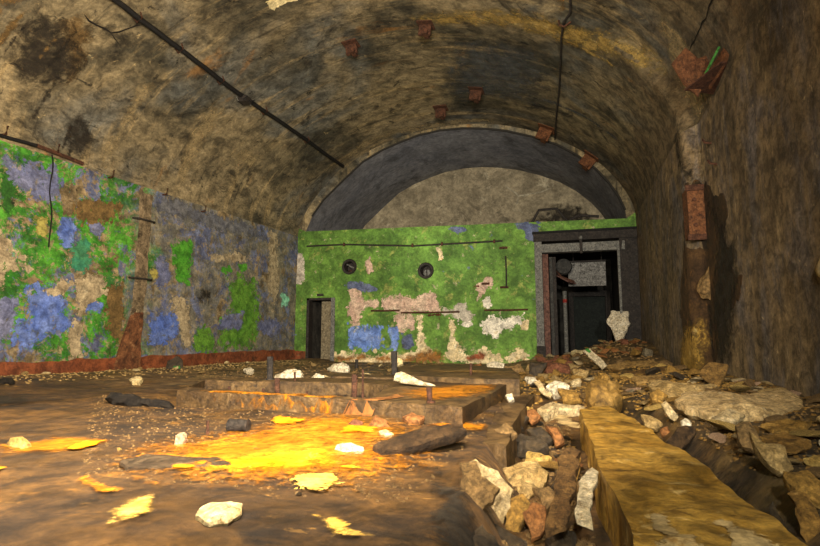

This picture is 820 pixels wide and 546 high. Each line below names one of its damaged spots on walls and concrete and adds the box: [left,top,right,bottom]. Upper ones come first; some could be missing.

leakage [5,15,88,119]
peeling [265,0,298,11]
crack [689,0,713,51]
peeling [334,257,530,364]